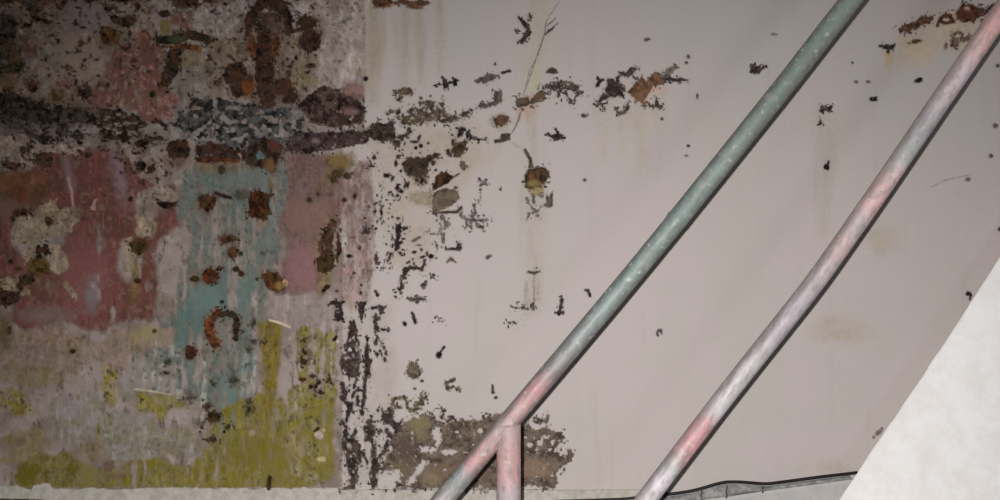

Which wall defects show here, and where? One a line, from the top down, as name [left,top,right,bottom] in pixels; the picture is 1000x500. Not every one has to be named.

corrosion [893,0,994,37]
corrosion [146,0,326,117]
crack [510,4,558,162]
corrosion [624,64,691,109]
corrosion [487,93,540,165]
corrosion [130,131,286,232]
peeling [0,0,664,495]
corrosion [151,300,268,379]
corrosion [208,370,256,417]